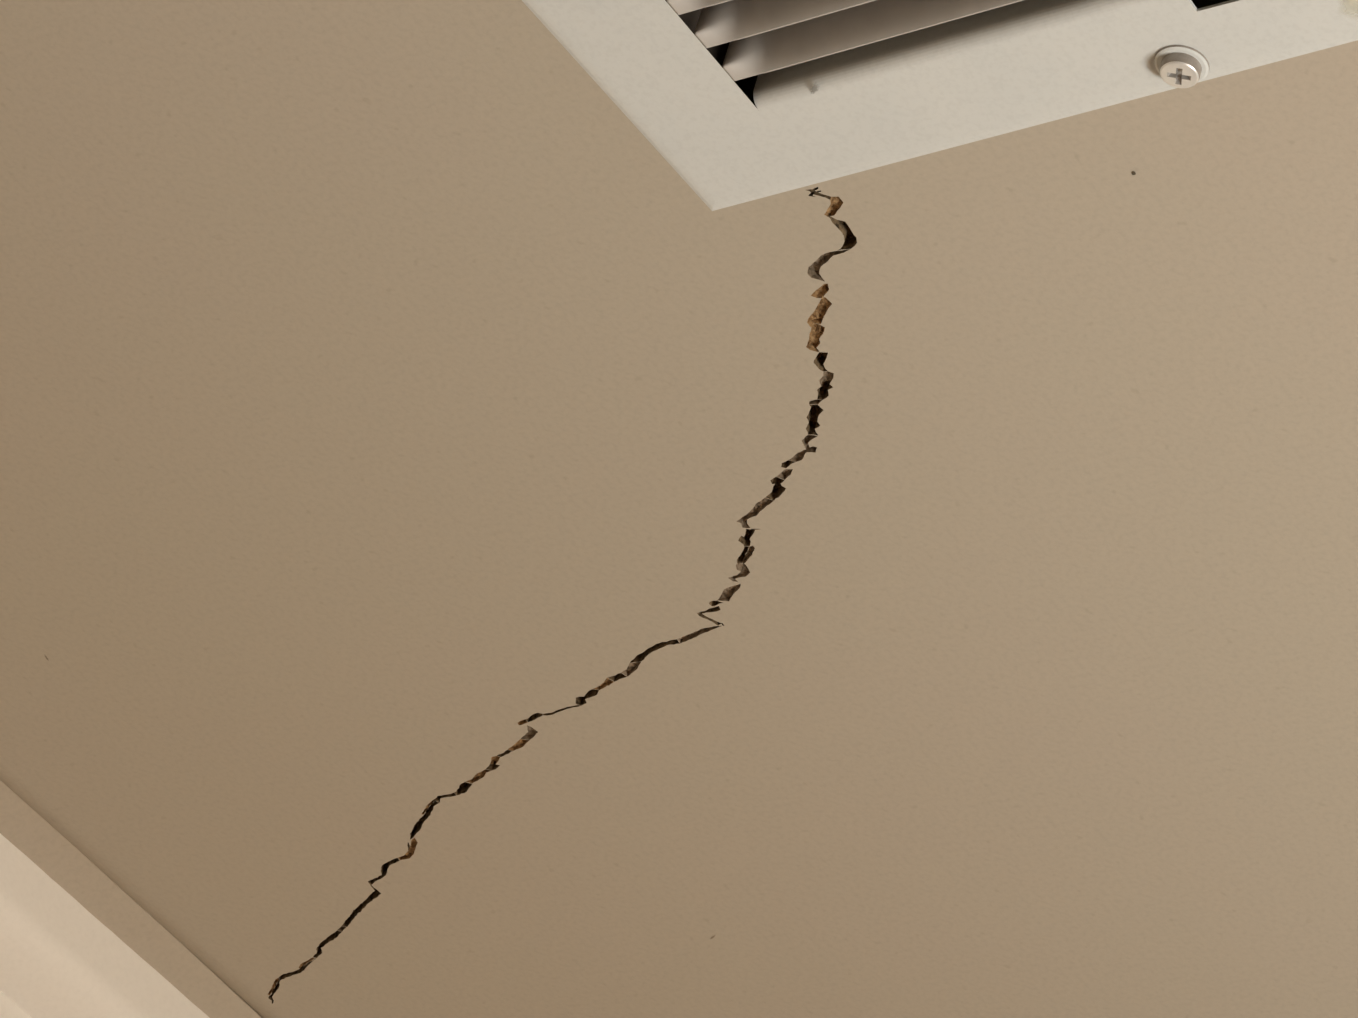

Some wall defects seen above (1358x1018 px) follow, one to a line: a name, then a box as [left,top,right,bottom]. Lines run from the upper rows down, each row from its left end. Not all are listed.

crack [267,187,857,1004]